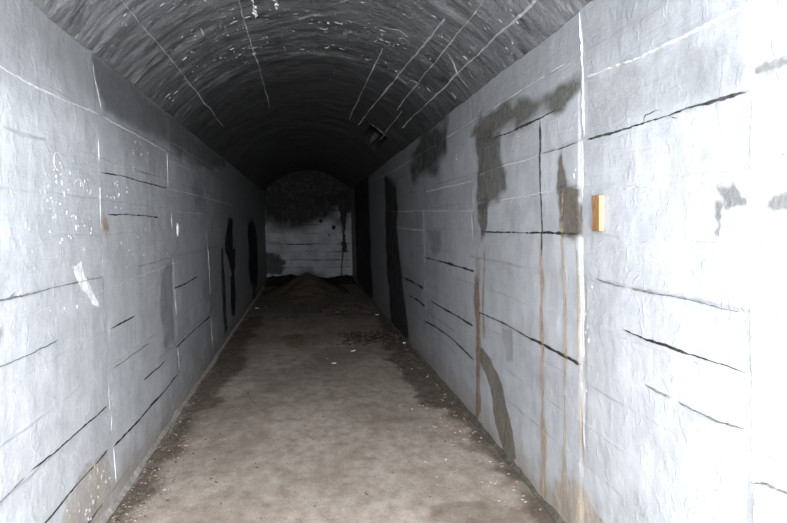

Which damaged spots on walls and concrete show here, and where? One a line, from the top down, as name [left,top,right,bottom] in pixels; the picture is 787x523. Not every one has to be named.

water stain [473,82,582,237]
water stain [769,193,787,210]
water stain [377,177,524,481]
rust [474,280,484,380]
rust [576,259,586,344]
crack [625,330,747,374]
crack [0,406,107,503]
crack [750,482,787,494]